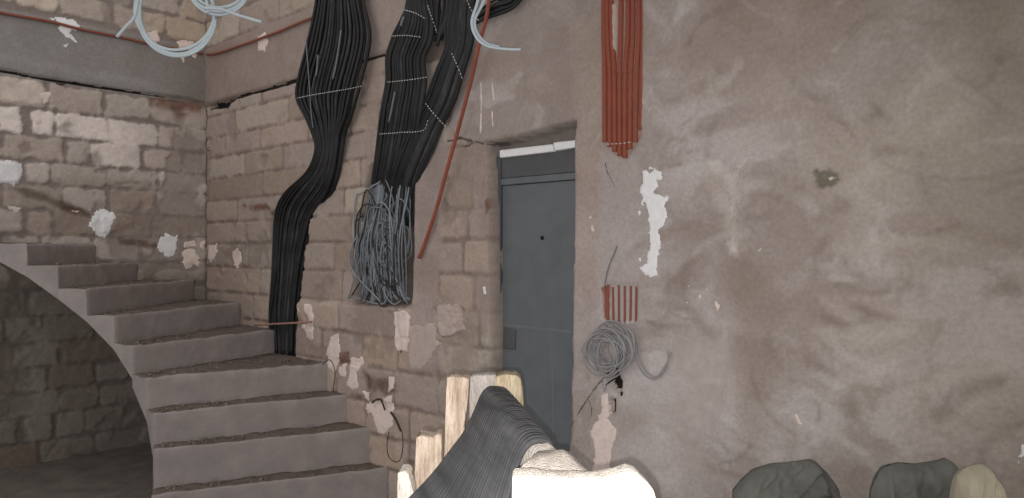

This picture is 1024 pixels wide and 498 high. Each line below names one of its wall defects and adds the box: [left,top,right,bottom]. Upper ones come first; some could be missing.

crack [237,79,297,99]
flaking render [638,167,668,277]
water stain [815,170,838,187]
flaking render [591,374,623,471]